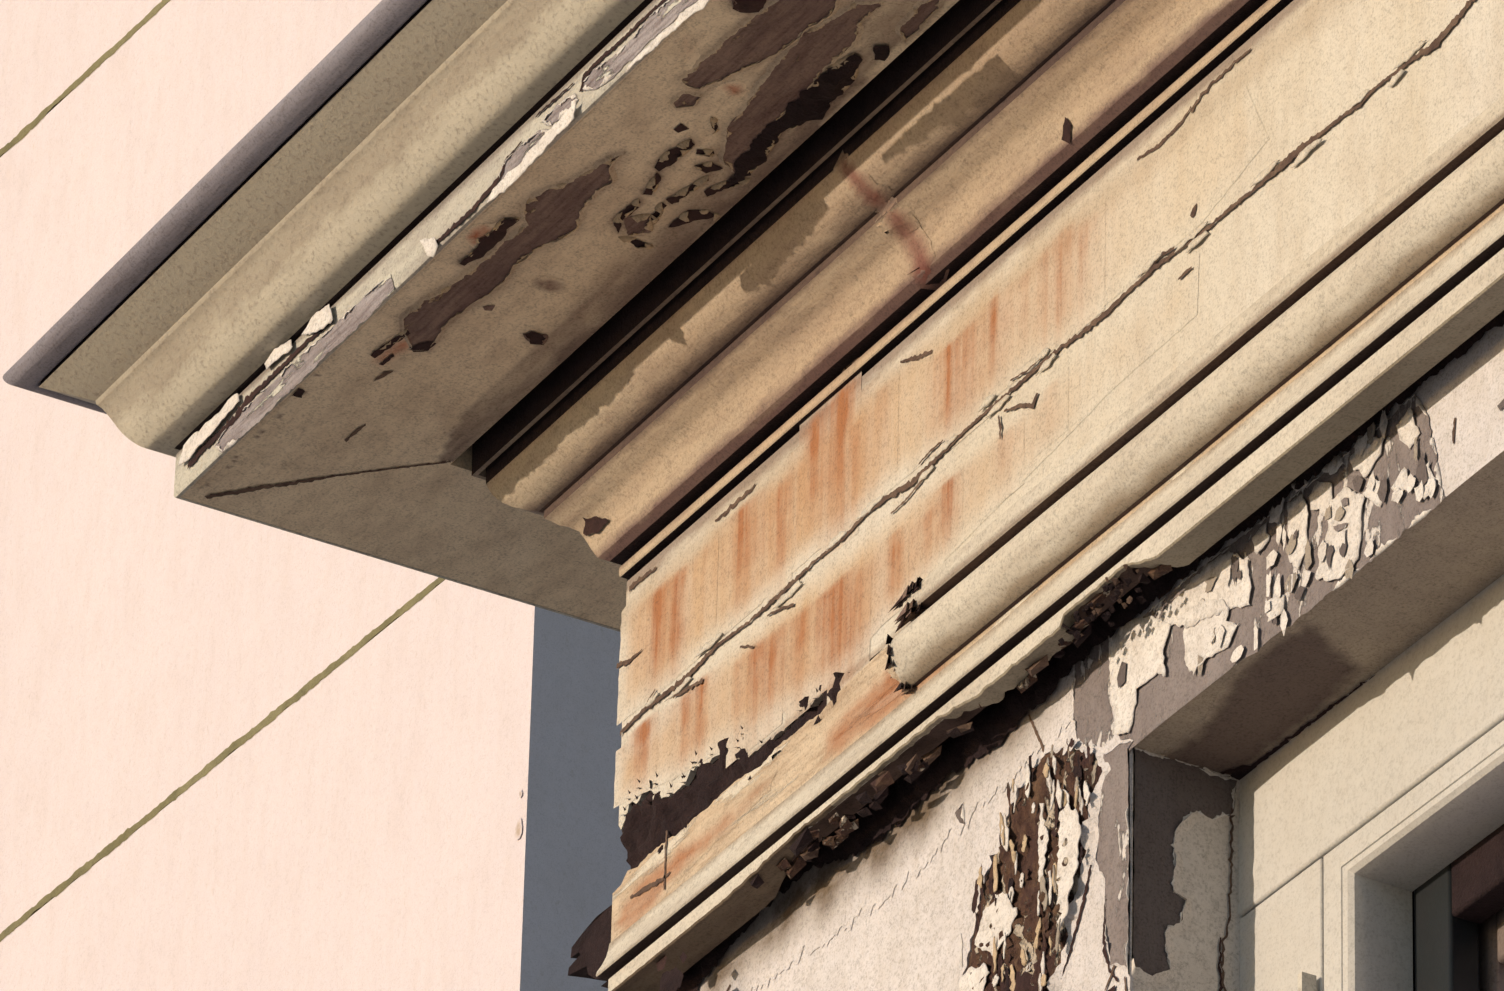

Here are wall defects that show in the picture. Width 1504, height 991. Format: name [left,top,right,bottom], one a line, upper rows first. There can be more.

peeling [487,0,710,203]
peeling [612,0,885,250]
peeling [399,151,627,352]
peeling [178,274,394,466]
rust [614,84,1269,808]
crack [620,0,1475,736]
crack [616,649,642,669]
crack [1028,714,1044,752]
crack [1062,865,1127,991]
peeling [957,394,1446,991]
leakage [1157,616,1377,776]
crack [1218,675,1375,991]